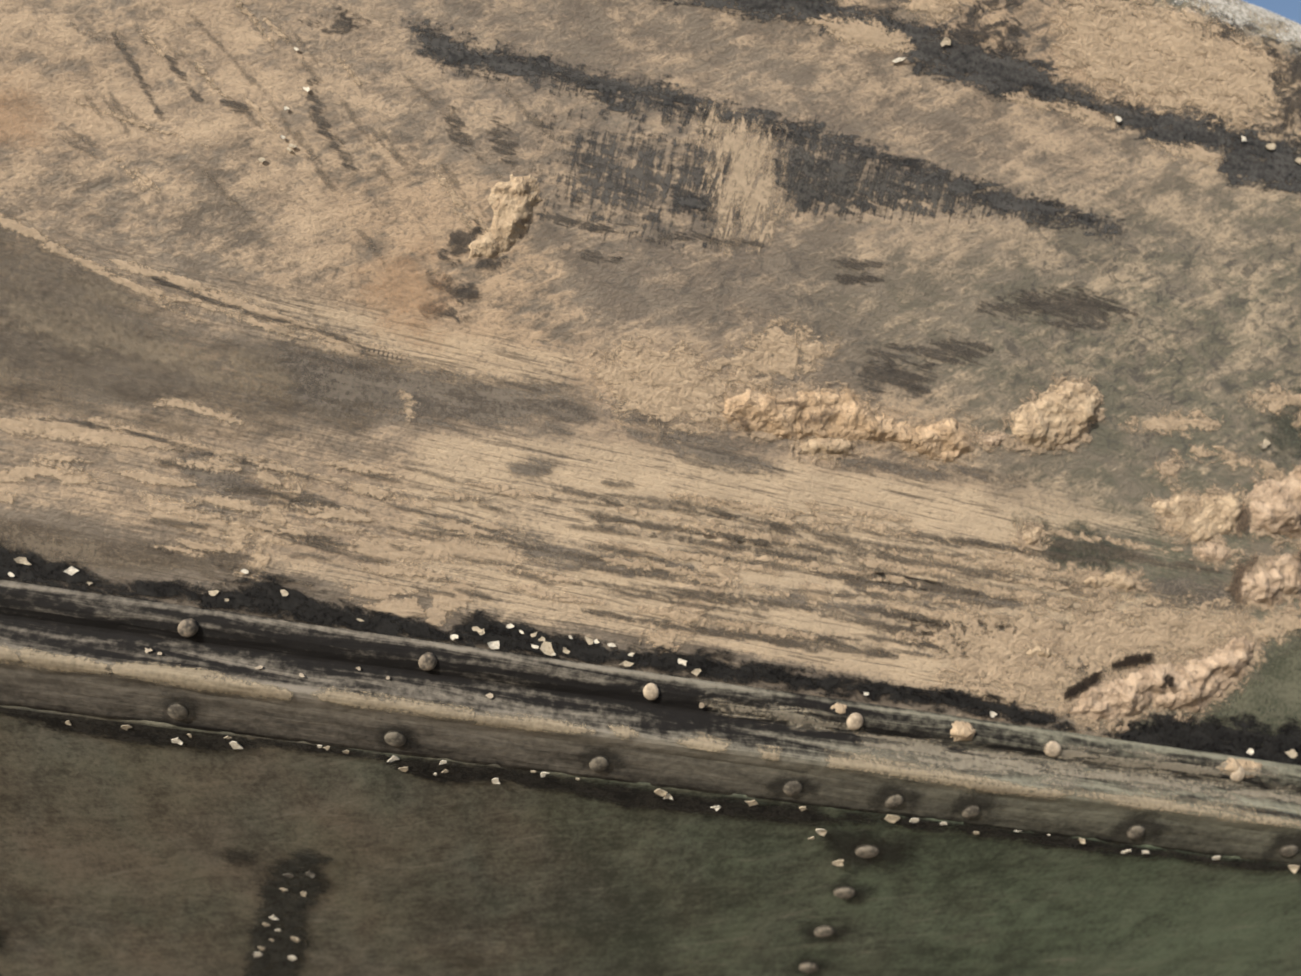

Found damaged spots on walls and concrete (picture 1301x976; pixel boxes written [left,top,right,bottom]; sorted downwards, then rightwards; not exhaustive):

leakage [0,519,312,586]
leakage [150,452,1238,657]
crack [1063,652,1174,699]
leakage [225,849,332,976]